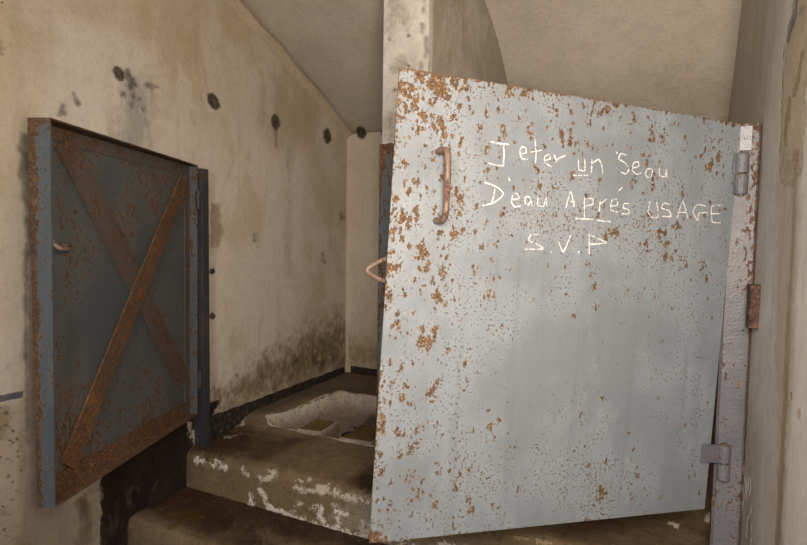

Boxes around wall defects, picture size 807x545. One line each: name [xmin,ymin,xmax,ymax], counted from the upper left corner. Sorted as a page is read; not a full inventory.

spalling [778,0,807,186]
damp [214,329,345,403]
spalling [513,536,552,545]